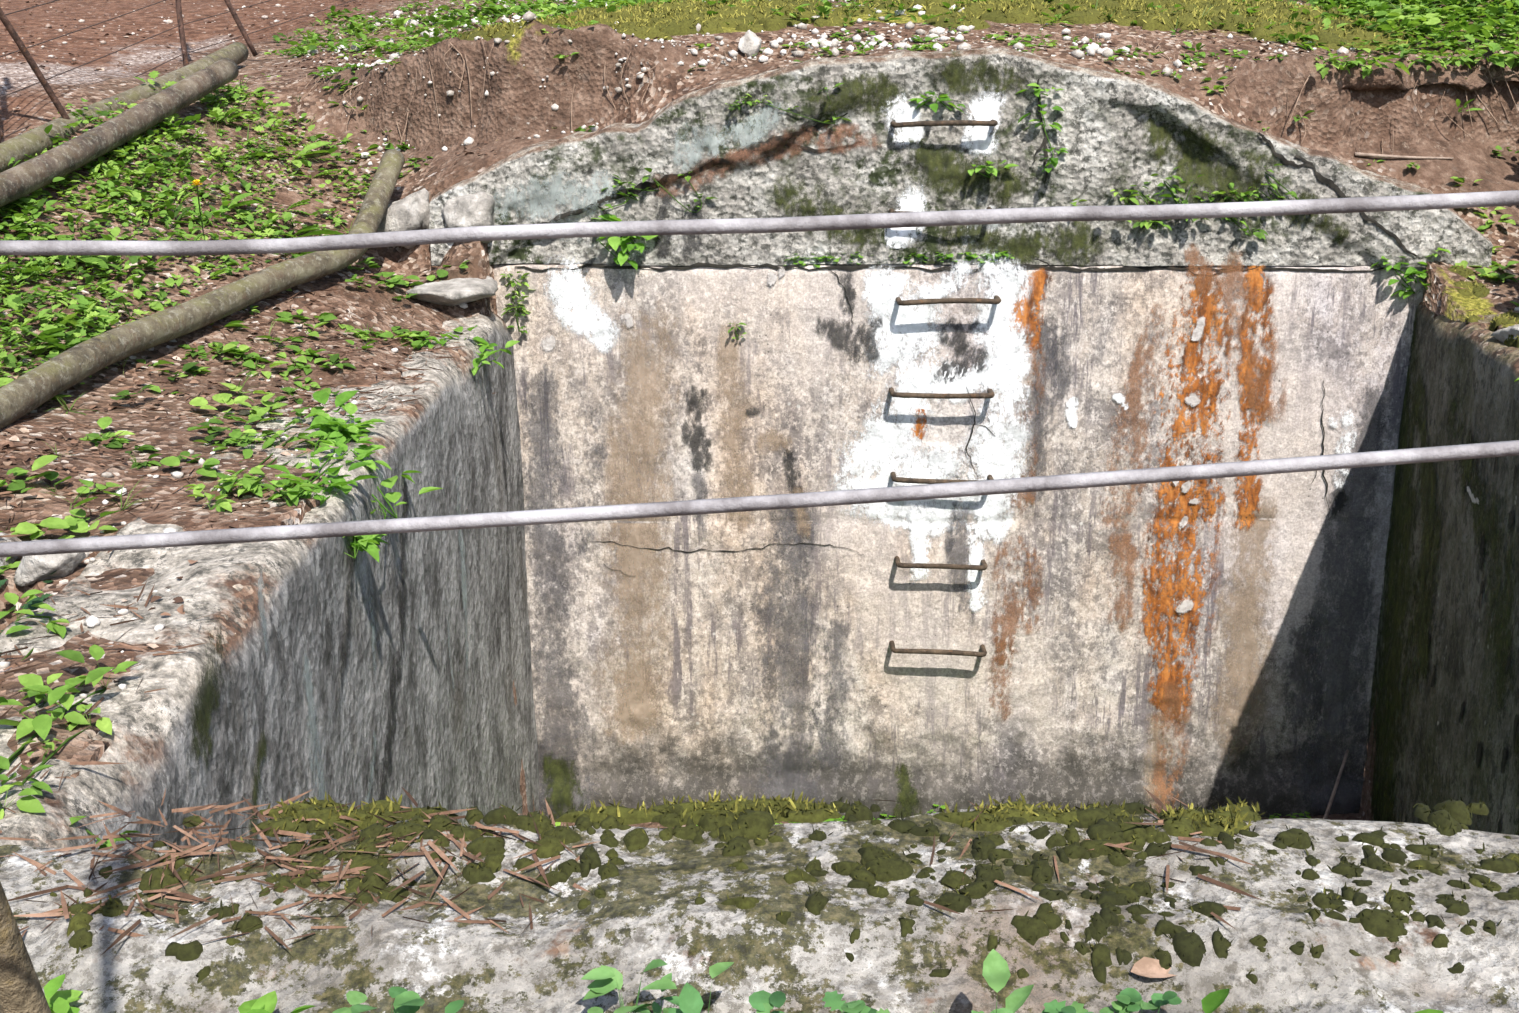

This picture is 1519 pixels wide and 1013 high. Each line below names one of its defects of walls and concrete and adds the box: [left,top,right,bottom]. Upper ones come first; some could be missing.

damp [654,194,704,260]
efflorescence [887,96,923,144]
damp [885,186,926,248]
crack [515,112,1417,323]
efflorescence [961,89,1006,156]
damp [365,482,408,805]
damp [501,307,753,820]
damp [752,507,848,802]
corrosion [912,409,928,440]
damp [816,254,1079,622]
damp [1112,393,1128,409]
corrosion [1101,246,1285,813]